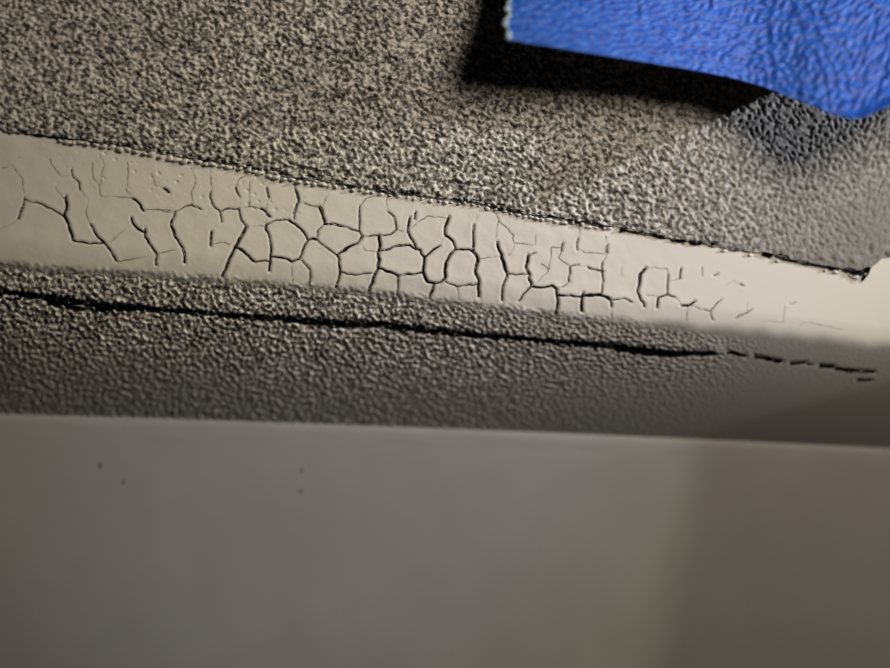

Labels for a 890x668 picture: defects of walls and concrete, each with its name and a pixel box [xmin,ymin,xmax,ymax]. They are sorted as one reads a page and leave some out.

crack [0,156,841,330]
crack [0,287,875,381]